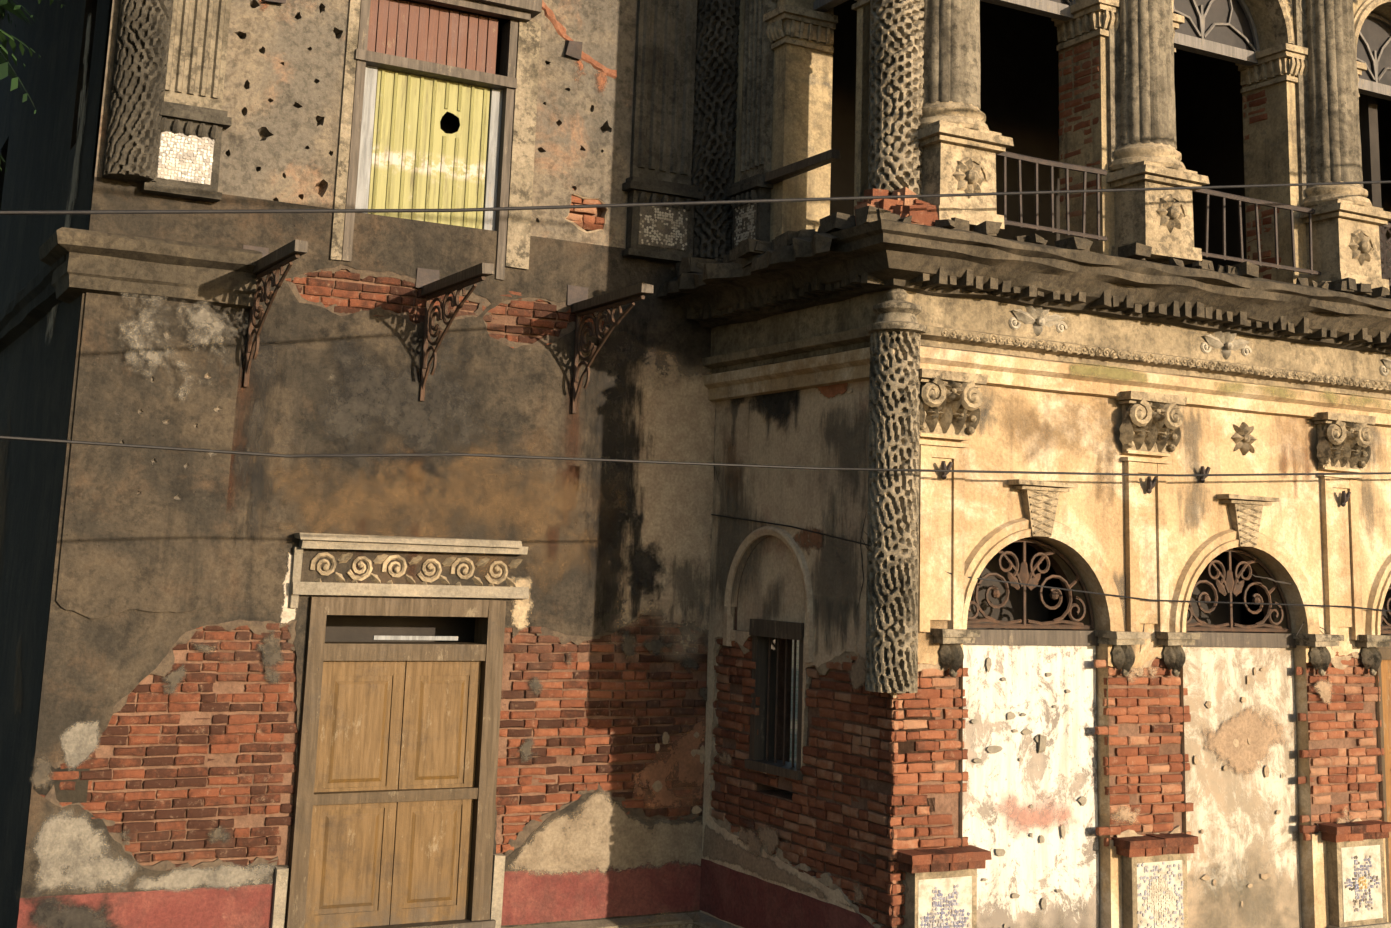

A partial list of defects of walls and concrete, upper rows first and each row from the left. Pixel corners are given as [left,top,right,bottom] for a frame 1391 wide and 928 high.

flaking render [565,188,609,233]
flaking render [285,265,608,348]
damp [233,320,286,543]
damp [316,326,505,478]
damp [730,390,799,441]
damp [825,412,869,506]
damp [812,498,862,645]
flaking render [31,620,298,871]
flaking render [496,608,1003,928]
peeling [1007,712,1047,761]
peeling [1004,796,1087,844]
flaking render [1094,652,1386,847]